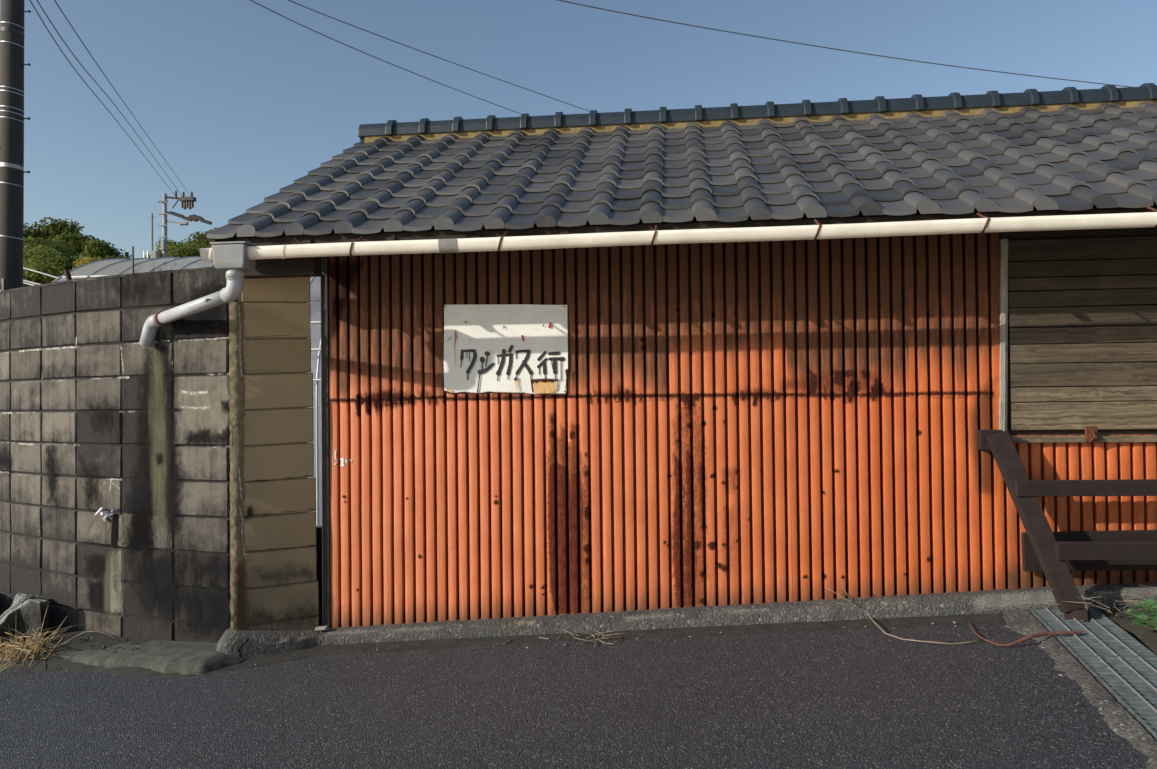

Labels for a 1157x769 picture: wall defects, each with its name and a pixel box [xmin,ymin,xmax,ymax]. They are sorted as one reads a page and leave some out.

leakage [19,443,64,504]
leakage [80,283,237,639]
rust [329,370,994,614]